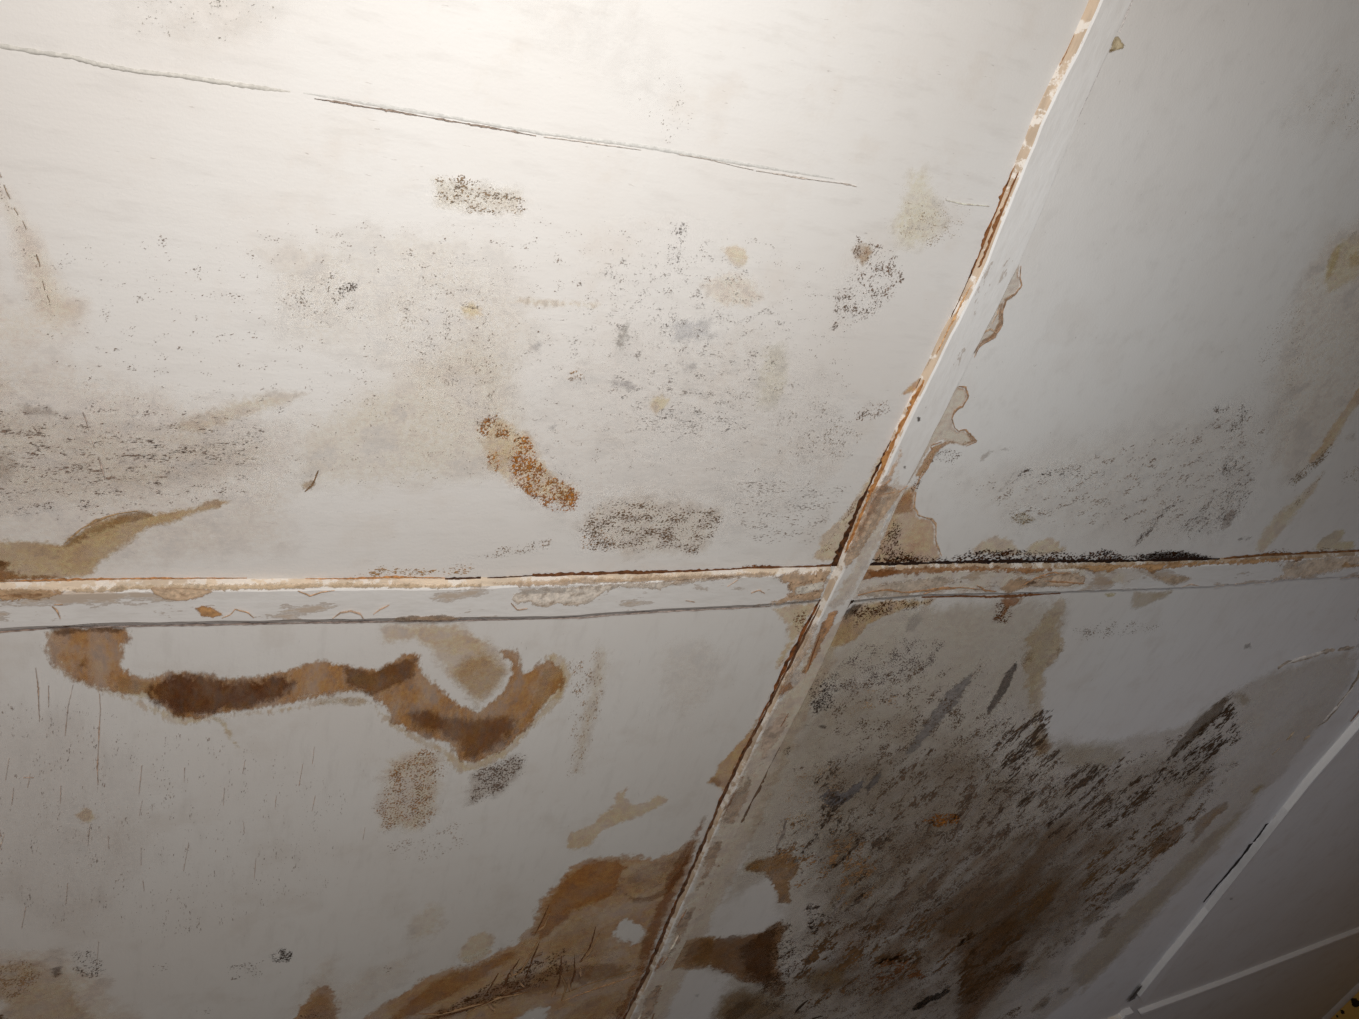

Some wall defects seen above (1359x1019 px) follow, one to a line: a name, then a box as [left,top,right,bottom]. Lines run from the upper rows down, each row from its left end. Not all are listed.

water stain [0,265,291,544]
water stain [305,175,904,555]
water stain [869,386,1359,566]
peeling [0,479,908,621]
peeling [794,611,838,674]
peeling [913,676,971,747]
peeling [987,663,1017,715]
peeling [858,556,1303,597]
water stain [734,634,1241,1019]
water stain [426,948,569,1019]